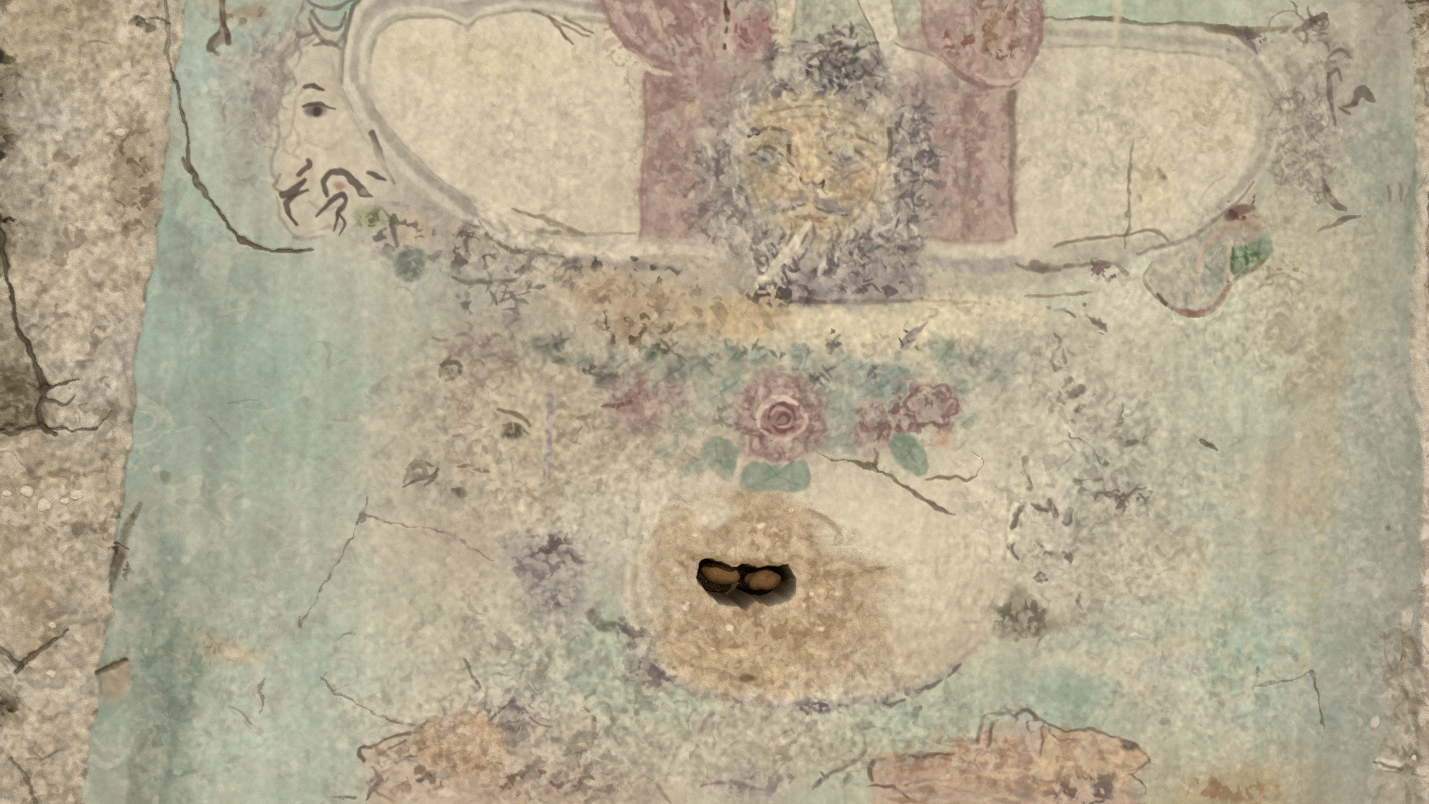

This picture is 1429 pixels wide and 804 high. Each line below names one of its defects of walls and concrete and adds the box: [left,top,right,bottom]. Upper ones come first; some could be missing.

crack [136,16,160,26]
crack [170,67,190,147]
crack [205,190,314,254]
crack [1421,168,1429,294]
crack [4,270,112,437]
crack [822,448,984,515]
crack [298,497,494,629]
spalling [634,481,907,713]
crack [228,678,266,725]
crack [320,632,422,727]
crack [1251,666,1325,737]
spalling [410,706,516,788]